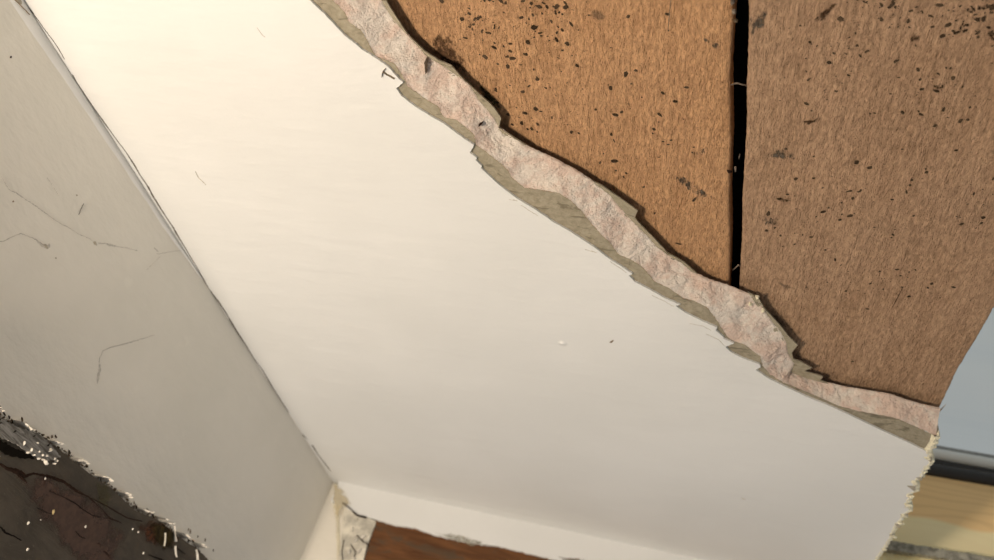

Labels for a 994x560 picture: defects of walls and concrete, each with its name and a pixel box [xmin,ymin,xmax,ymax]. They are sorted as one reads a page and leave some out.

damp [433,0,631,135]
damp [748,13,766,34]
damp [802,4,899,125]
damp [847,0,994,47]
damp [884,61,991,136]
damp [765,187,874,275]
spalling [313,0,940,560]
crack [0,463,143,559]
peeling [0,406,214,551]